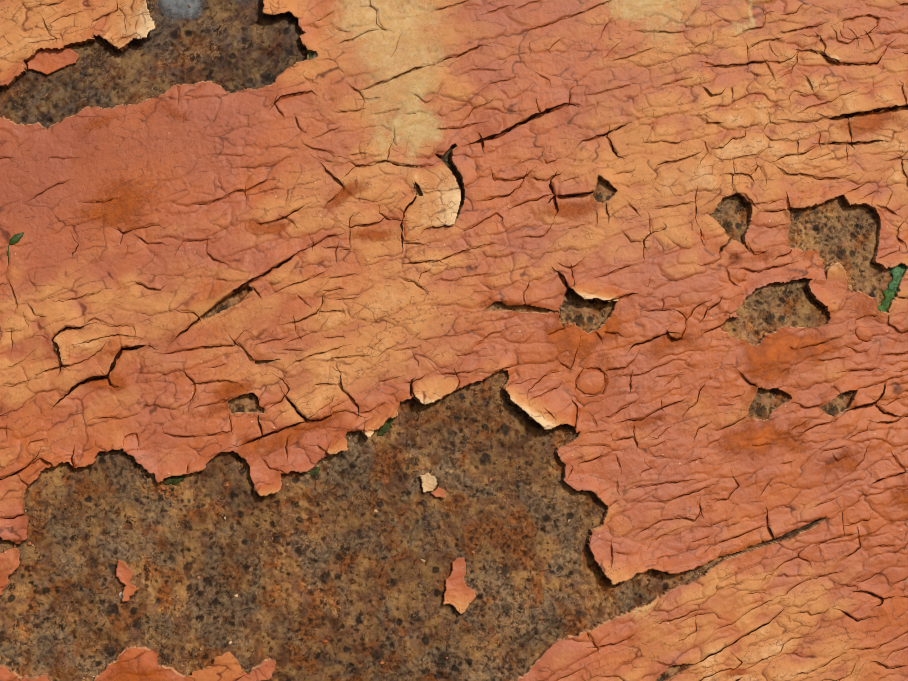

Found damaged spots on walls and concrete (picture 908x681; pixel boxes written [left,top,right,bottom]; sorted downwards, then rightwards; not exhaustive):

peeling [0,0,318,131]
crack [0,0,908,482]
peeling [483,274,625,334]
peeling [593,175,618,204]
peeling [710,193,753,256]
peeling [721,195,908,347]
rust [236,412,340,458]
peeling [0,369,827,681]
crack [445,242,798,553]
crack [652,297,908,681]
peeling [821,390,858,417]
crack [558,633,634,681]